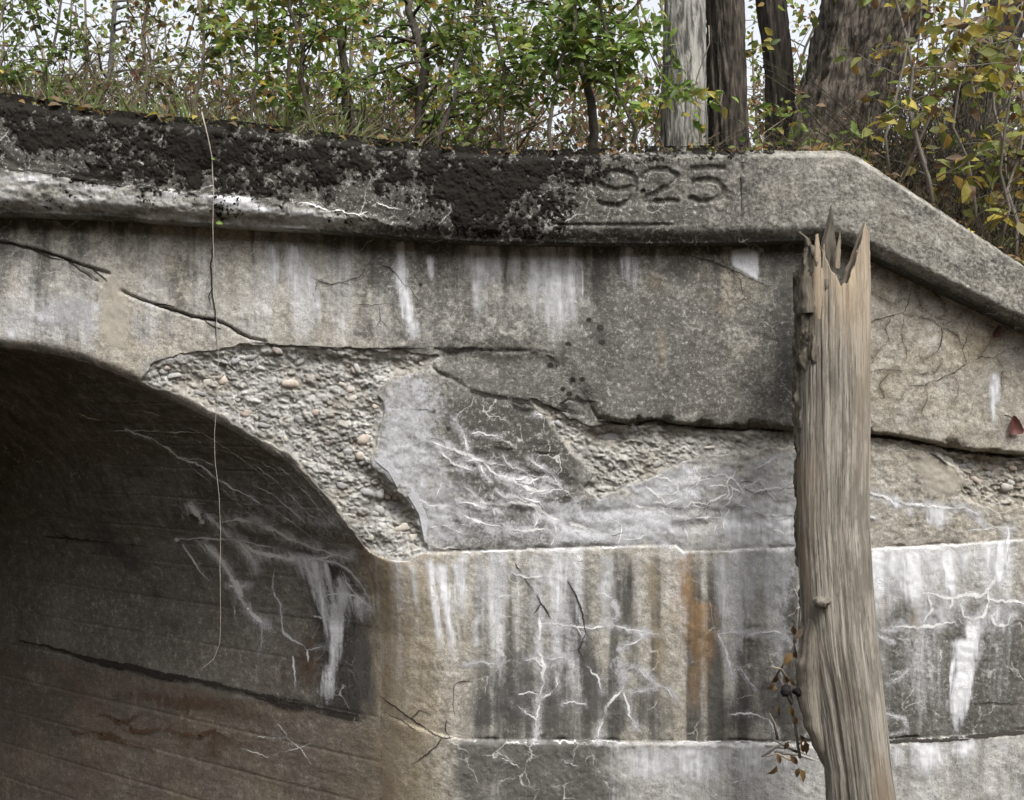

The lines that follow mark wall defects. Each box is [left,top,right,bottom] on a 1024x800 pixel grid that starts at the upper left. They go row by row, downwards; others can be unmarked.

crack [871,283,1006,413]
spalling [143,344,453,561]
crack [0,231,796,766]
spalling [529,377,795,499]
spalling [870,438,1024,512]
leakage [295,557,375,708]
leakage [411,460,800,728]
leakage [872,542,1010,622]
leakage [949,608,1004,725]